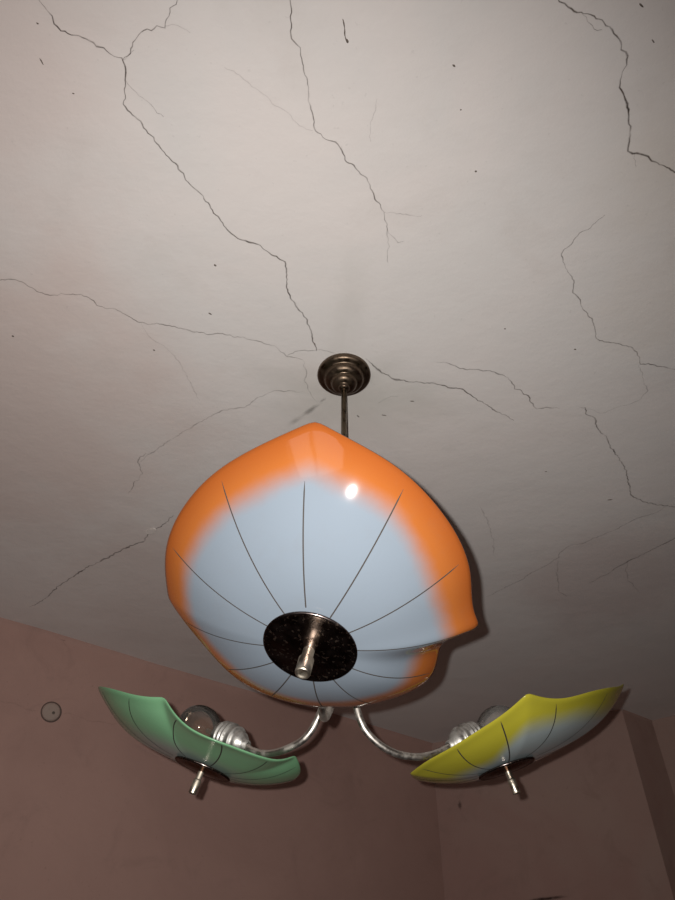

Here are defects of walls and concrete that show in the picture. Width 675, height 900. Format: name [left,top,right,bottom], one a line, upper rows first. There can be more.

crack [41,3,176,164]
crack [558,0,675,173]